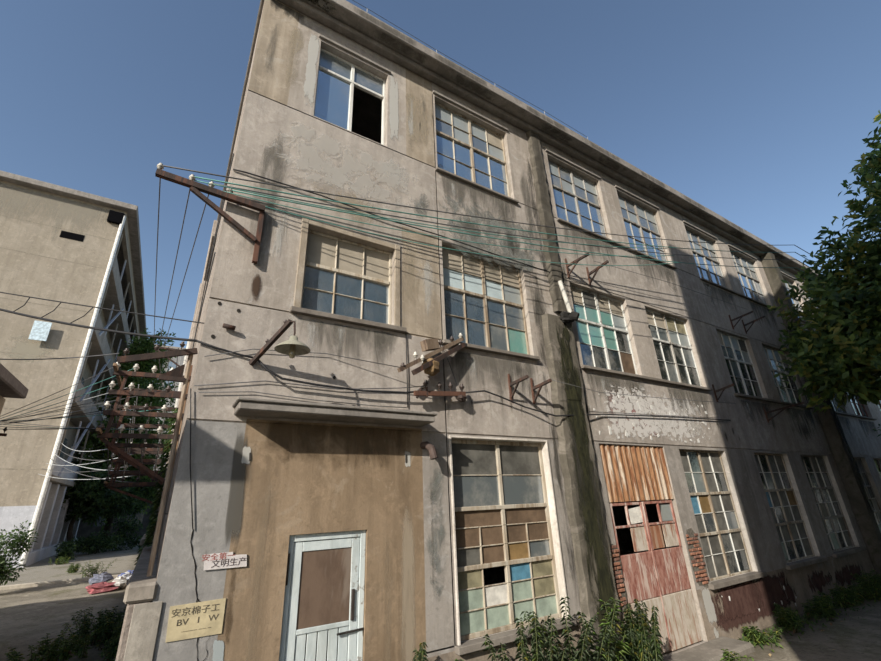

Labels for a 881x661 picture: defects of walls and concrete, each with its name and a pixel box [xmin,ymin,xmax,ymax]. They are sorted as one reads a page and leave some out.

water stain [263,147,282,225]
peeling [593,383,710,444]
water stain [556,326,642,657]
crack [190,529,201,603]
peeling [686,528,797,631]